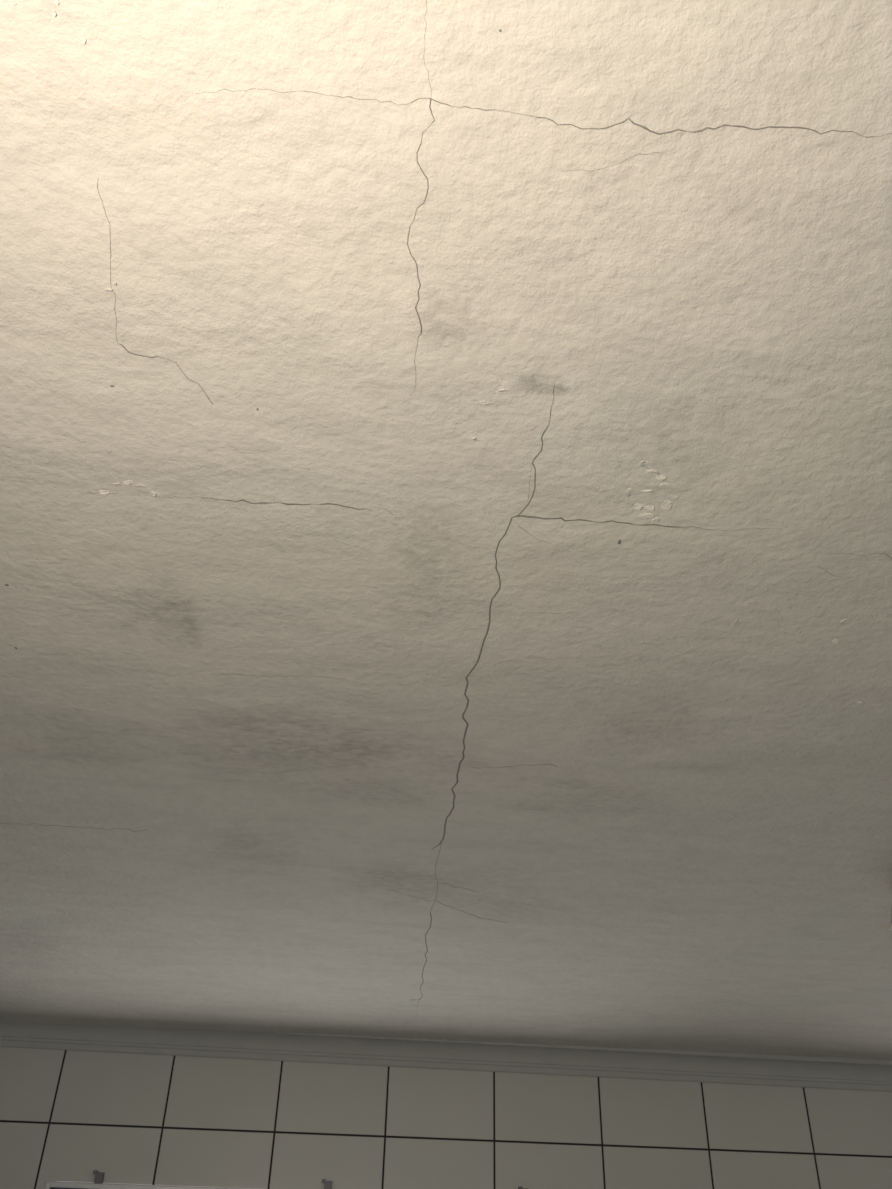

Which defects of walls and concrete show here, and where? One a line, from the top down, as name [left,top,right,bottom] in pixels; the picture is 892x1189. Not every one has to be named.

crack [97,182,213,404]
crack [196,0,892,395]
crack [88,490,396,516]
crack [416,384,789,1017]